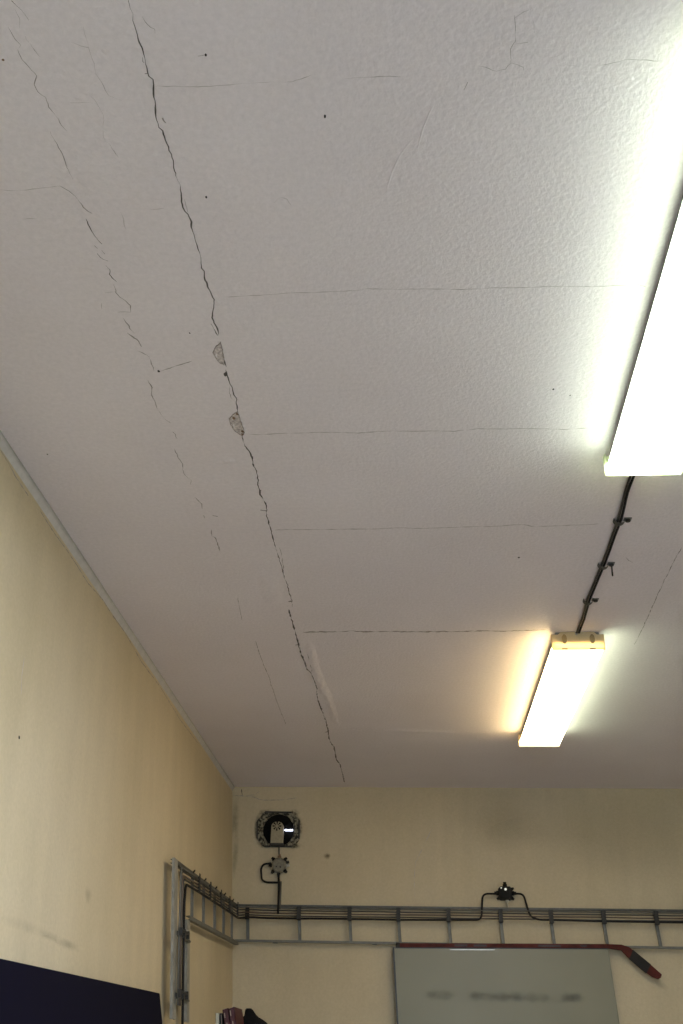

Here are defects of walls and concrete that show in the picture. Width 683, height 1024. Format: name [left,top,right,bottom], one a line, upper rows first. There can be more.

crack [6,1,220,551]
crack [436,283,645,291]
spalling [212,342,227,376]
crack [128,0,537,782]
spalling [229,411,244,436]